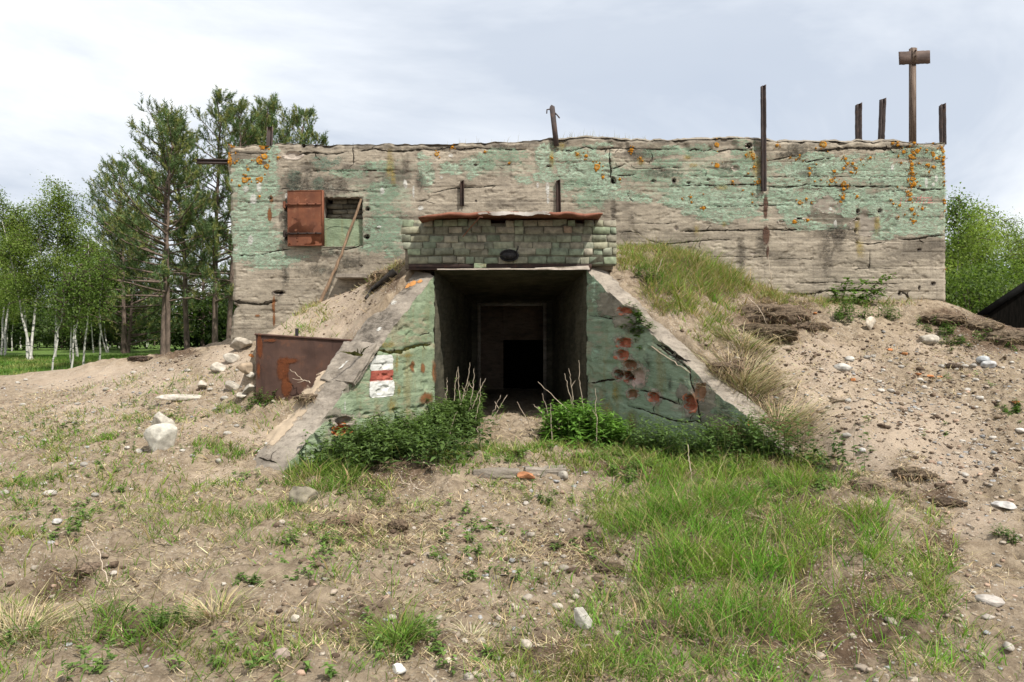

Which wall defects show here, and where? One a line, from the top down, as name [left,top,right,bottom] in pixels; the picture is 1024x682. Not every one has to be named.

peeling [229,144,407,272]
peeling [416,139,947,251]
peeling [596,292,663,406]
crack [587,343,715,438]